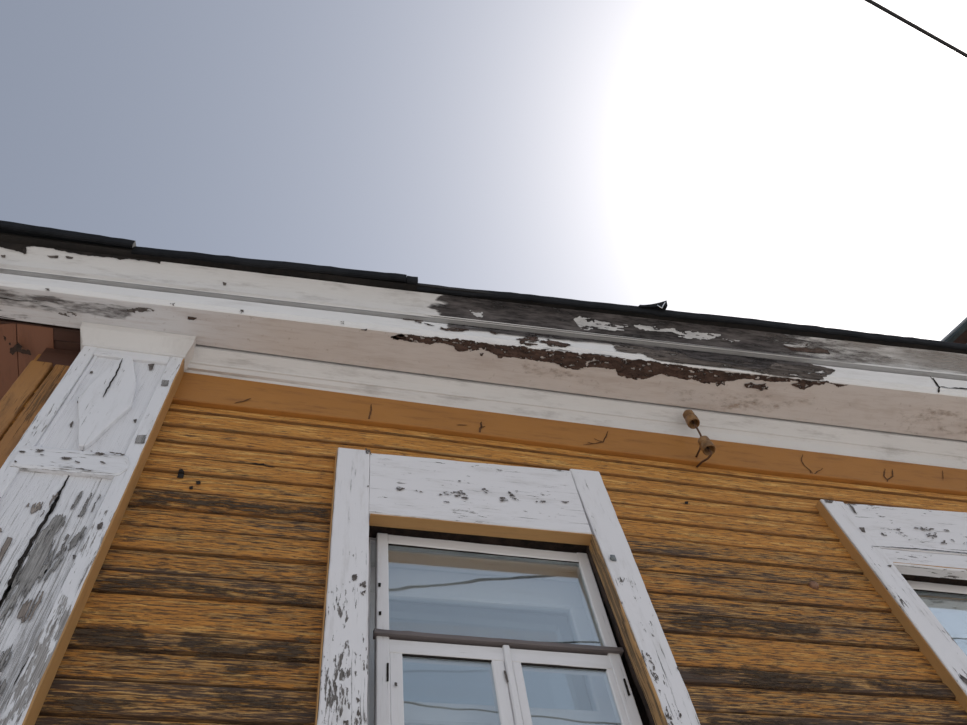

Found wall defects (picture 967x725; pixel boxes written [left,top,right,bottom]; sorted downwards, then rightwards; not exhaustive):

crack [103,358,123,397]
peeling [391,316,846,391]
leakage [428,295,889,369]
crack [0,478,68,608]
peeling [0,491,103,629]
peeling [0,644,13,694]